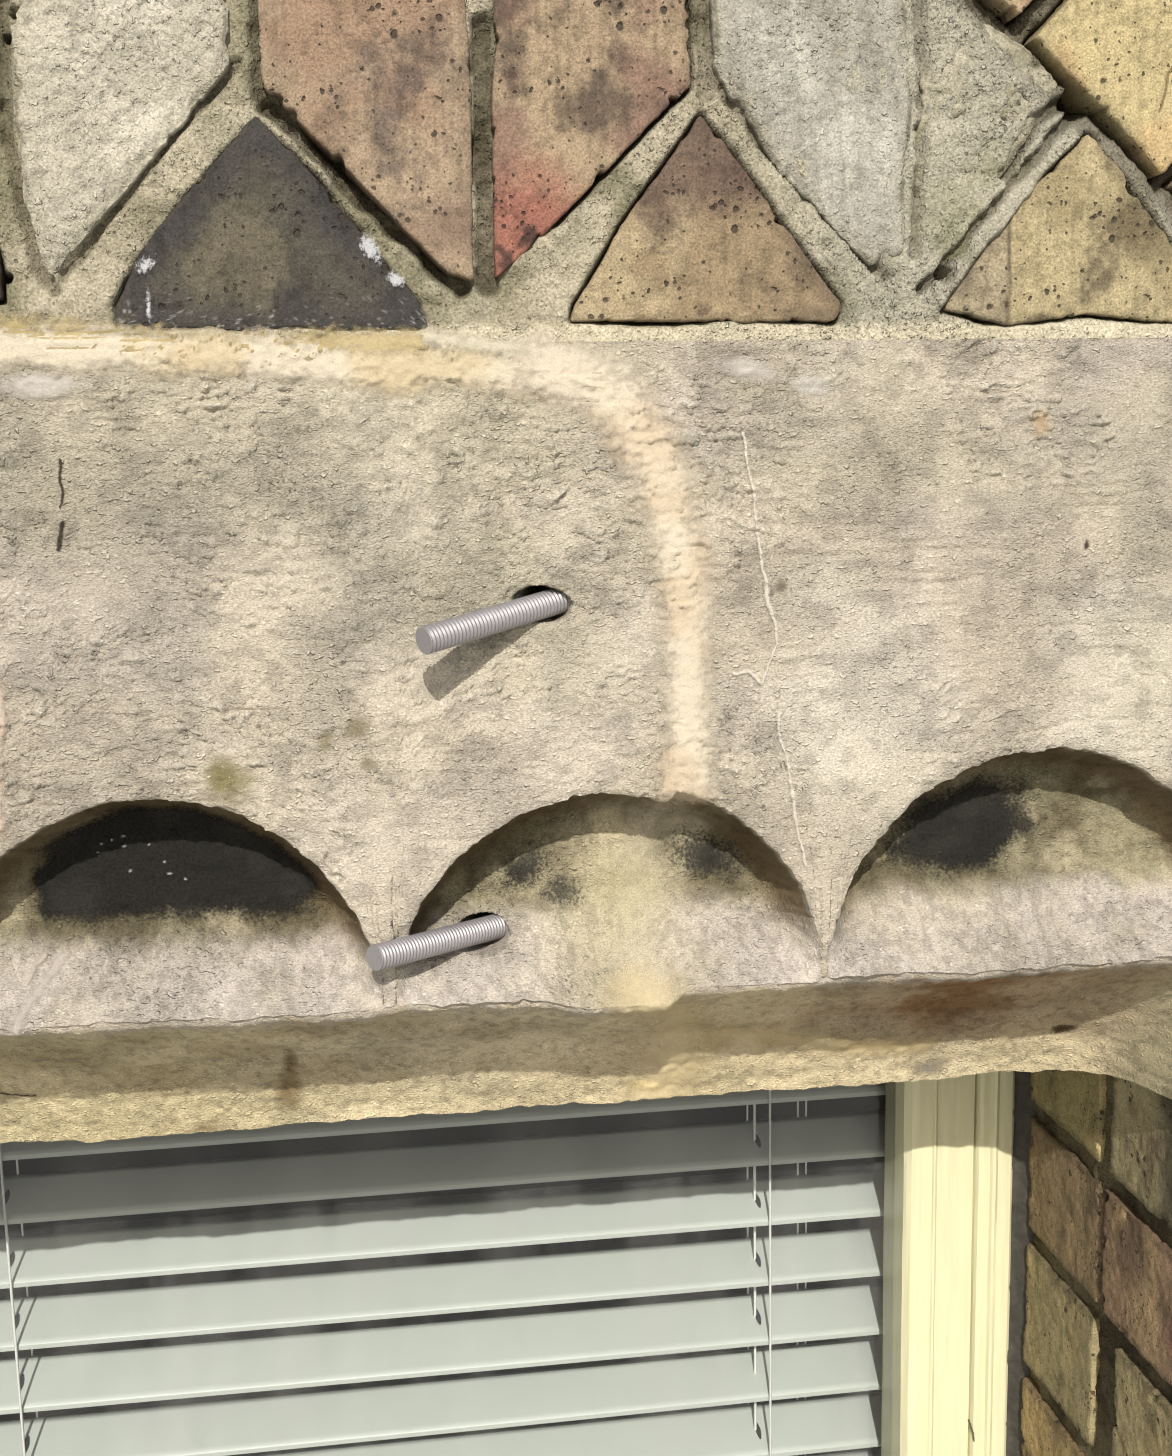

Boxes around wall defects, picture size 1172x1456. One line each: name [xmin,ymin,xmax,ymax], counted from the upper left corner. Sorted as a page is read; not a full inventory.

crack [0,315,808,867]
crack [628,981,927,1098]